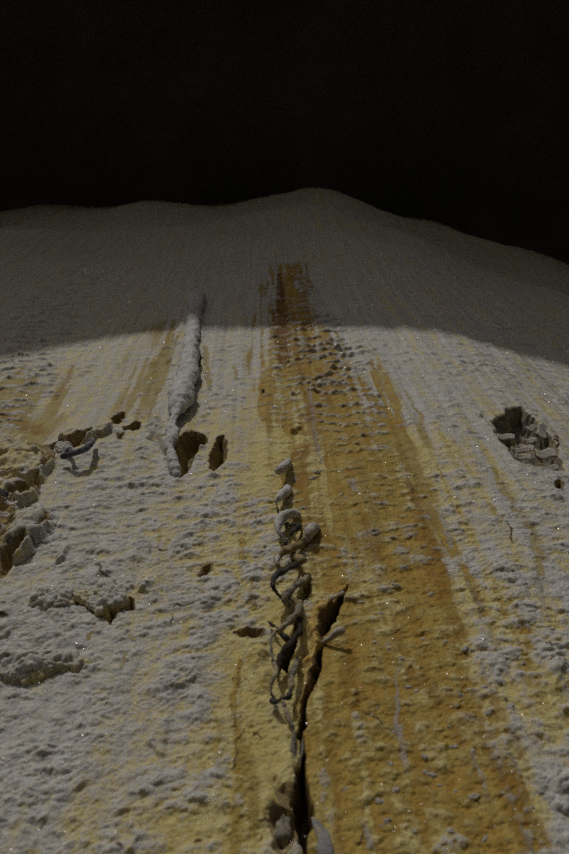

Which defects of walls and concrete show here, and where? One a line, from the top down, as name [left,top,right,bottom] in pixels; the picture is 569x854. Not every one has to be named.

spalling [0,427,92,579]
spalling [65,579,135,625]
spalling [110,411,142,439]
spalling [175,431,228,476]
rust [246,262,550,854]
spalling [493,407,564,490]
rust [213,658,258,854]
crack [283,594,345,854]